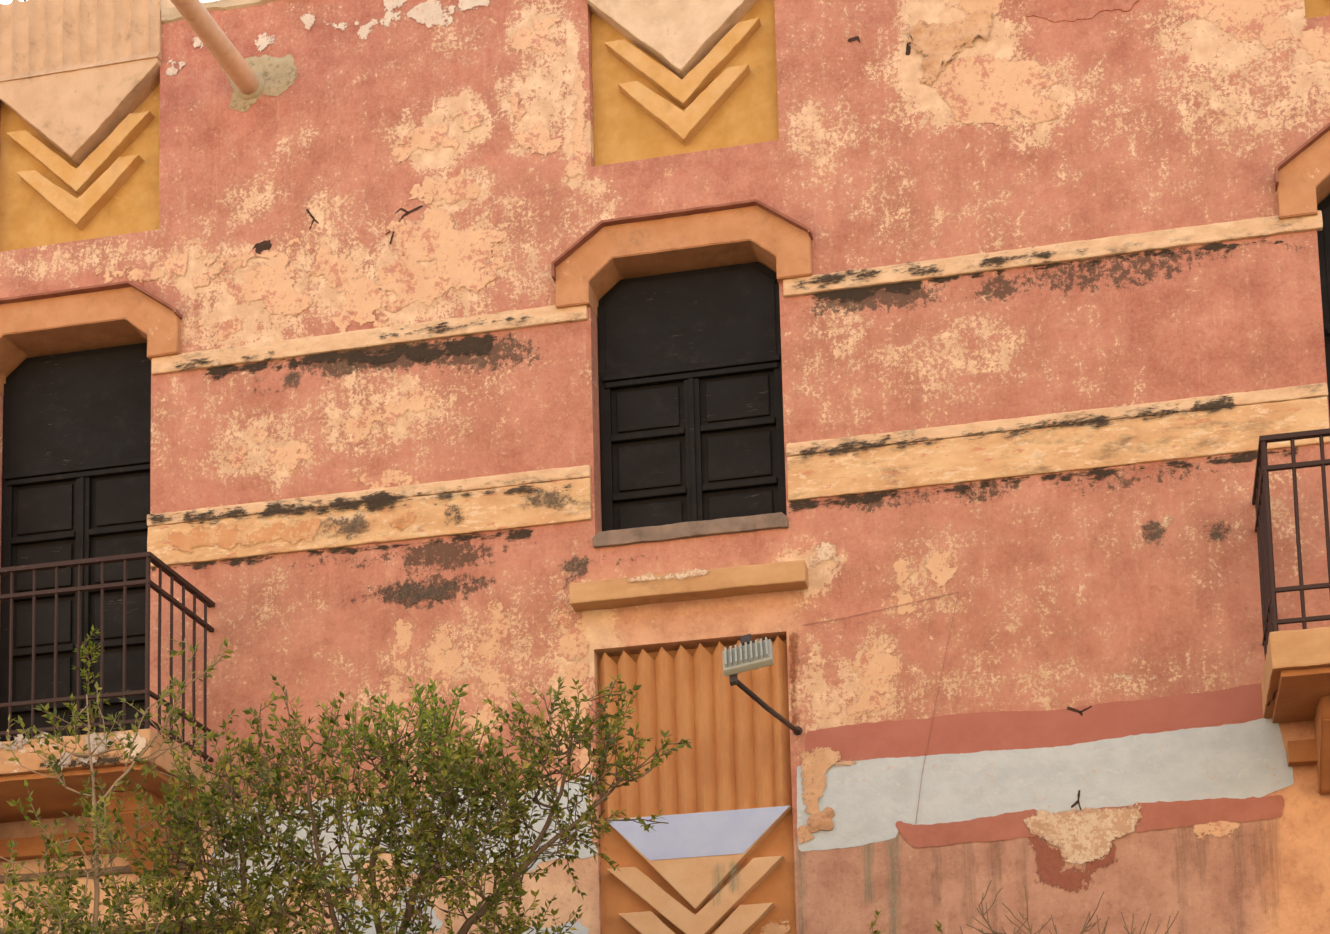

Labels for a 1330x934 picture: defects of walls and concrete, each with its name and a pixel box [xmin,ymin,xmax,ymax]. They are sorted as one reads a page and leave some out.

peeling [295,0,495,39]
peeling [907,0,1065,130]
leakage [176,316,527,388]
mould [963,395,1236,440]
mould [786,434,943,458]
leakage [1166,447,1300,469]
leakage [933,464,1145,493]
leakage [789,490,900,513]
peeling [0,731,49,752]
peeling [45,731,146,769]
peeling [797,747,863,845]
spalling [896,795,1284,867]